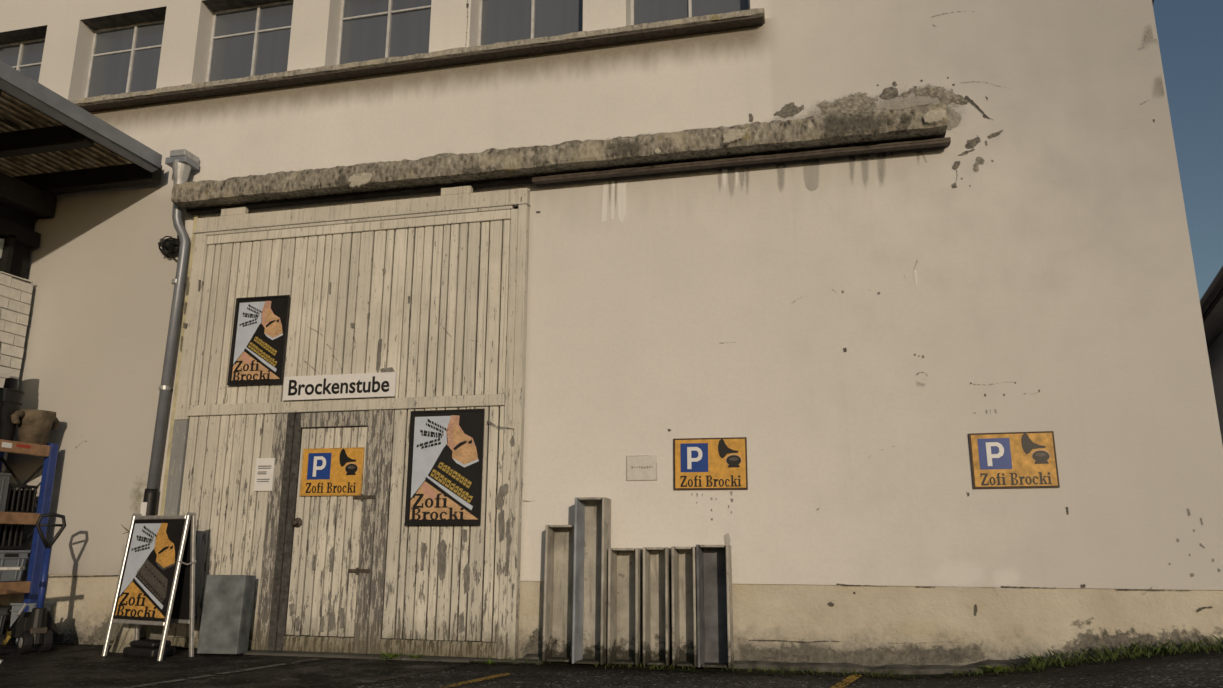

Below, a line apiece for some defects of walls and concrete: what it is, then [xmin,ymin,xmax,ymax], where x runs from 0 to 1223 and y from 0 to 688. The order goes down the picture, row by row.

spalling [773,77,969,135]
leakage [718,168,744,191]
leakage [850,153,885,183]
peeling [952,130,1003,188]
leakage [739,639,984,667]
leakage [1053,621,1223,659]